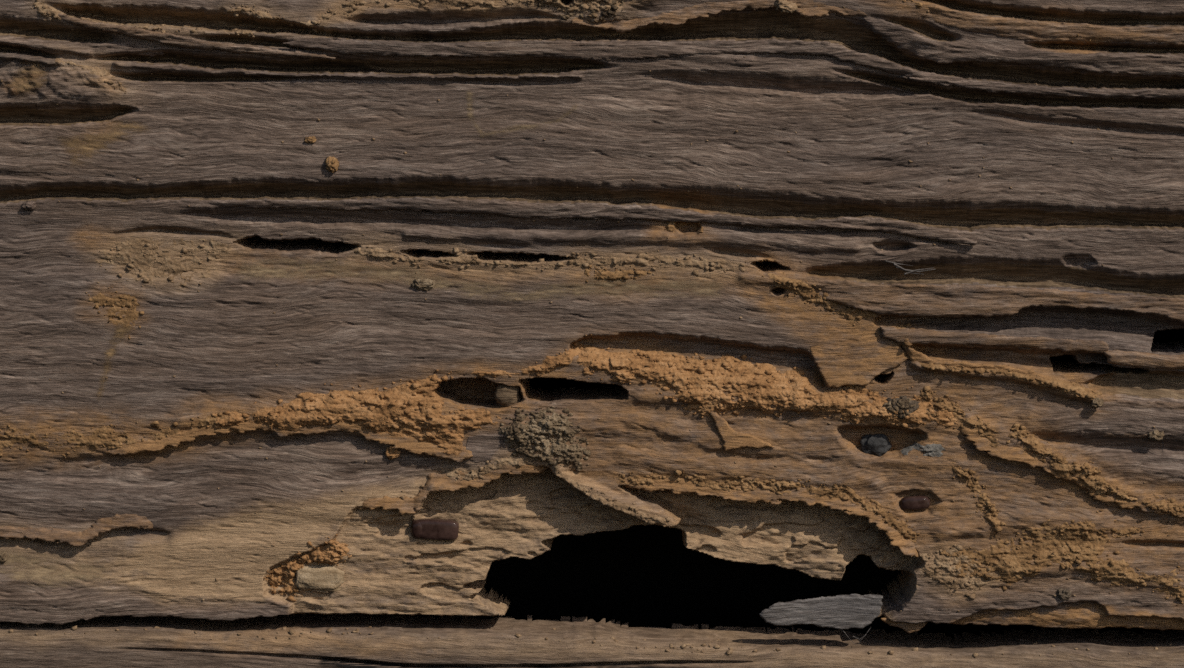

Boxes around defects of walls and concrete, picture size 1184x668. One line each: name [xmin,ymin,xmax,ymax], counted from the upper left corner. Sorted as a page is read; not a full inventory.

crack [0,6,1184,137]
crack [422,208,458,216]
peeling [810,325,1074,406]
peeling [438,432,464,455]
peeling [710,411,775,451]
peeling [960,426,1184,518]
spalling [264,464,928,633]